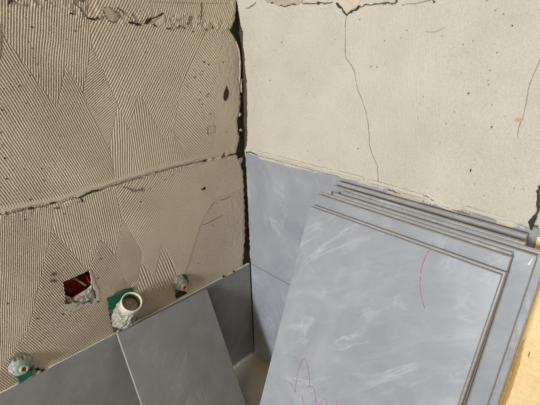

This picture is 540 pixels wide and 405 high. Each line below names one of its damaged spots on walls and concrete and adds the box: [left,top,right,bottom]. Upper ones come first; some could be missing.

crack [271,0,431,194]
crack [517,60,540,137]
crack [0,202,61,215]
crack [78,160,203,202]